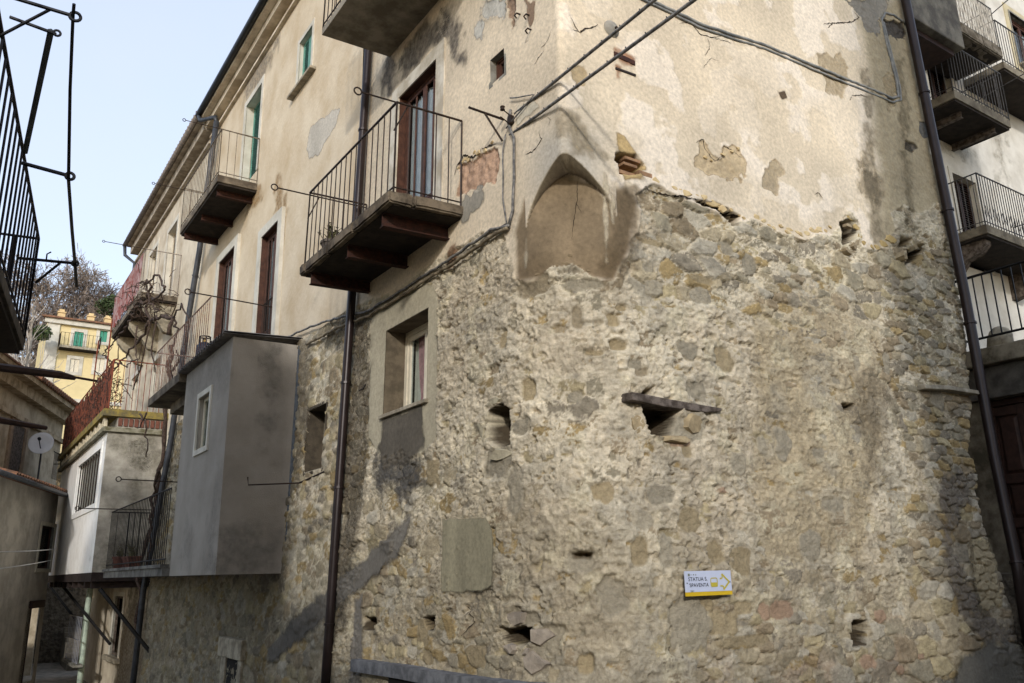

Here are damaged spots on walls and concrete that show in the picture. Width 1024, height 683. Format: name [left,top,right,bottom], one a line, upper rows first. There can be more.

flaking render [474,0,535,40]
damp [382,12,465,97]
flaking render [307,108,340,158]
flaking render [457,140,500,223]
crack [645,186,739,218]
flaking render [694,140,747,183]
flaking render [762,160,784,196]